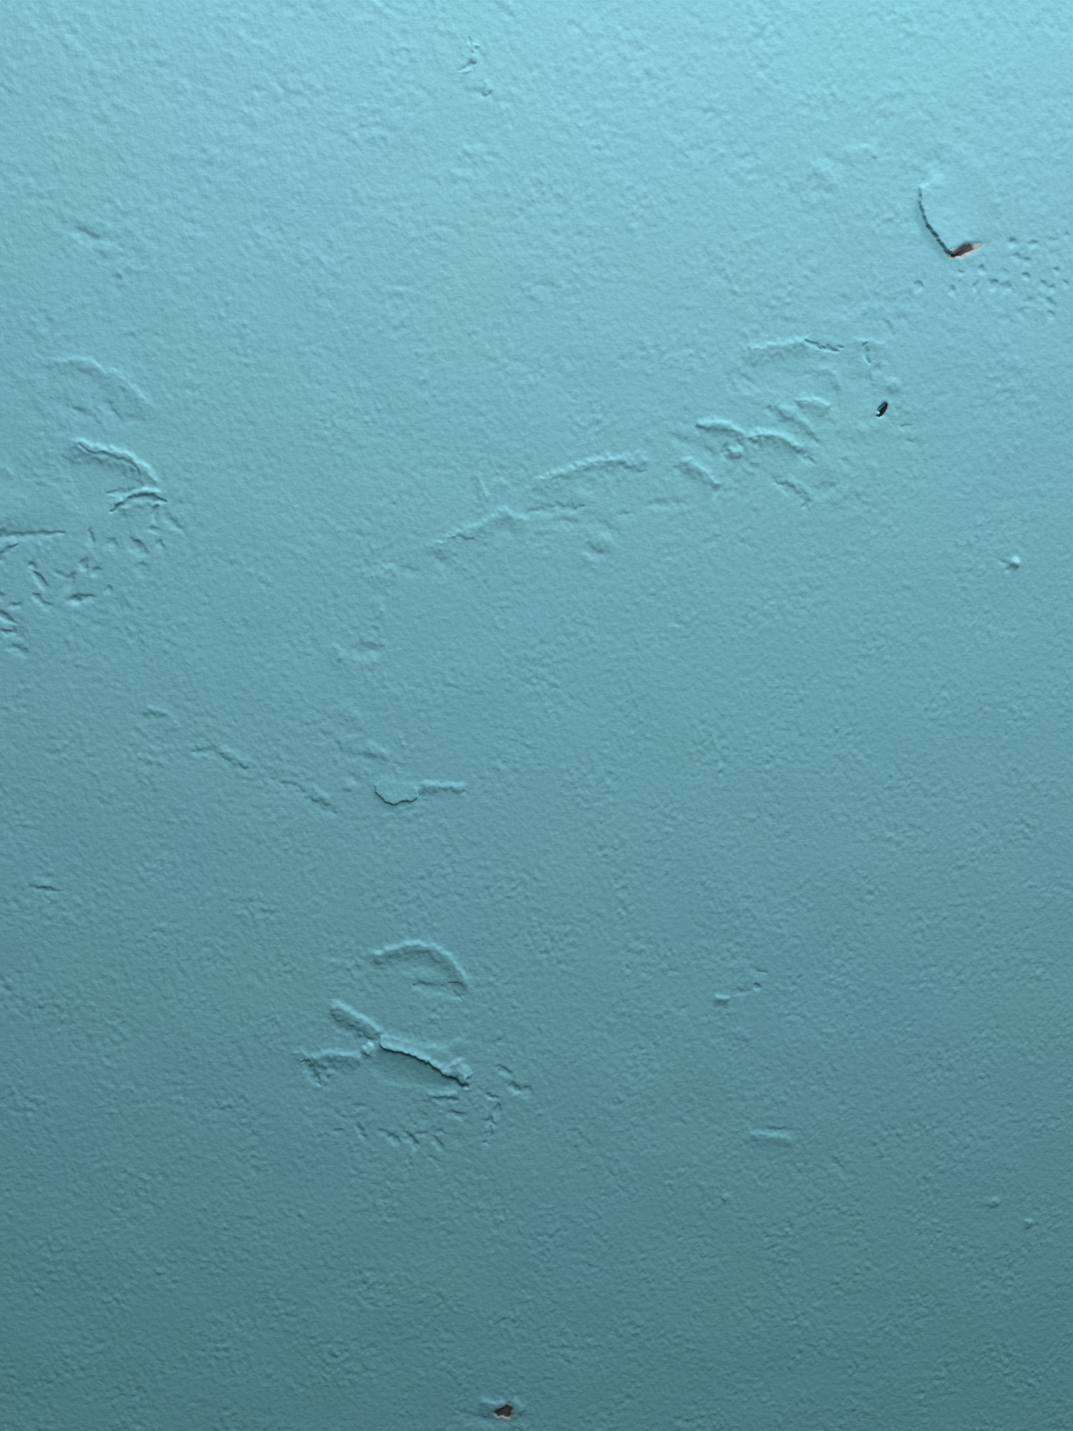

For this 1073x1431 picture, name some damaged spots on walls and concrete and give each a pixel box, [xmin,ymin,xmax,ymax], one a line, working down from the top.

peeling [913,135,1069,295]